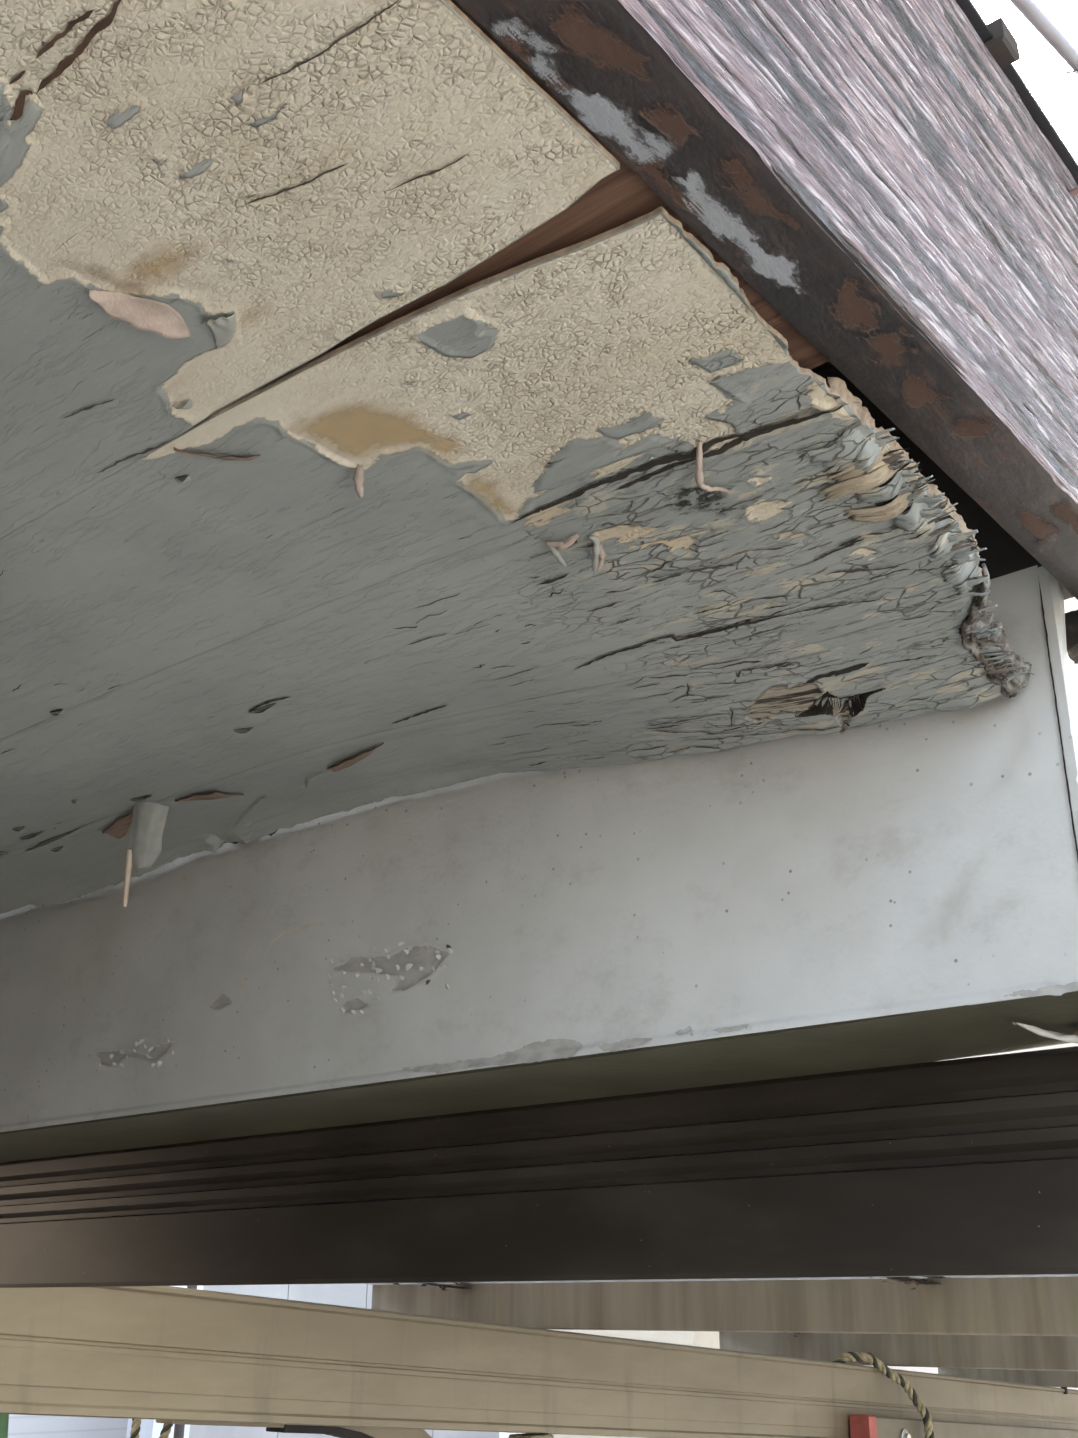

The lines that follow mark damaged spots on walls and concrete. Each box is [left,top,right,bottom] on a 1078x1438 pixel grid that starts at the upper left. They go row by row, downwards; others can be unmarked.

crack [9,0,121,120]
crack [259,0,399,85]
crack [246,163,349,205]
crack [380,154,467,193]
peeling [0,0,806,528]
peeling [826,278,951,409]
crack [511,402,860,524]
peeling [743,476,807,542]
peeling [799,381,980,596]
crack [392,518,951,766]
peeling [747,683,822,721]
peeling [328,942,454,1014]